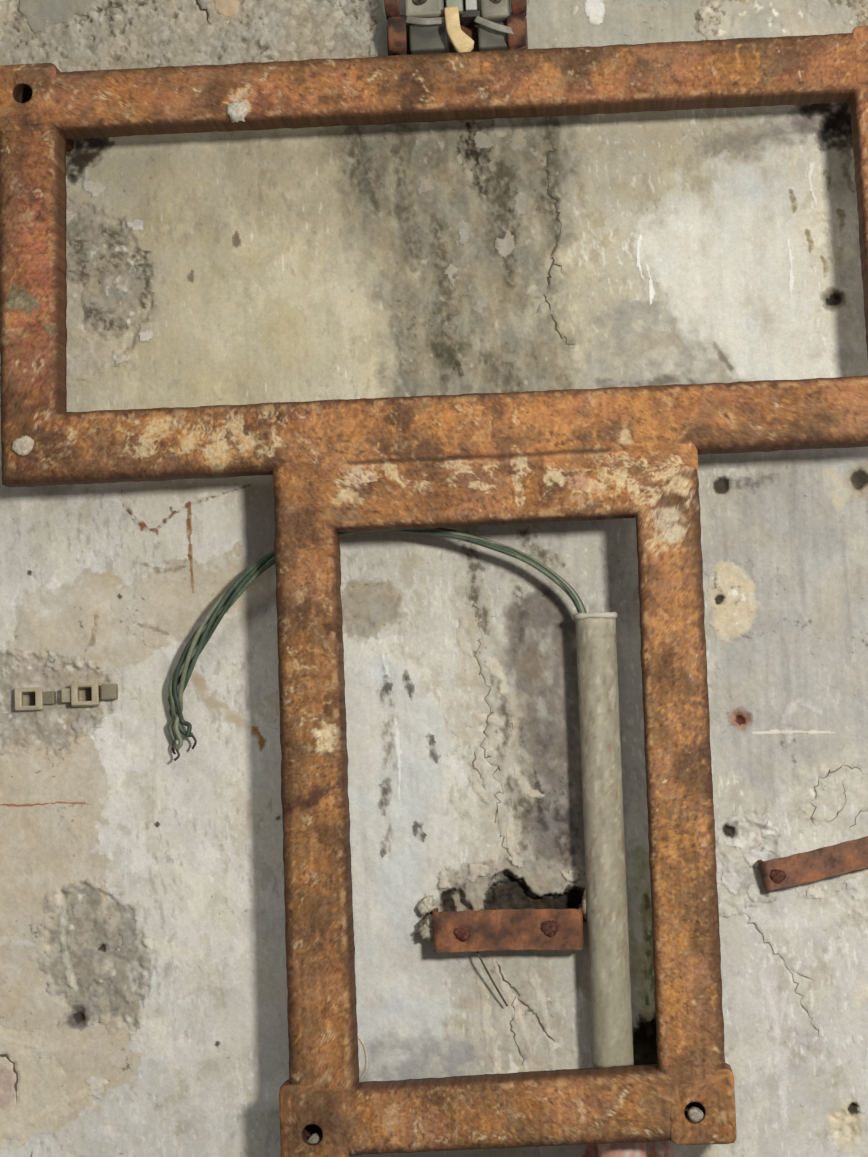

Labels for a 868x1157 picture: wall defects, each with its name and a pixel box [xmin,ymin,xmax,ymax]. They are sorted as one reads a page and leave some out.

flaking render [0,0,379,72]
flaking render [695,0,868,40]
water stain [319,114,749,398]
crack [529,142,567,342]
corrosion [119,484,254,593]
peeling [0,541,274,1151]
corrosion [187,670,267,752]
peeling [341,576,586,1062]
crack [466,595,513,865]
water stain [498,582,585,865]
crack [496,962,555,1068]
crack [745,913,819,1036]